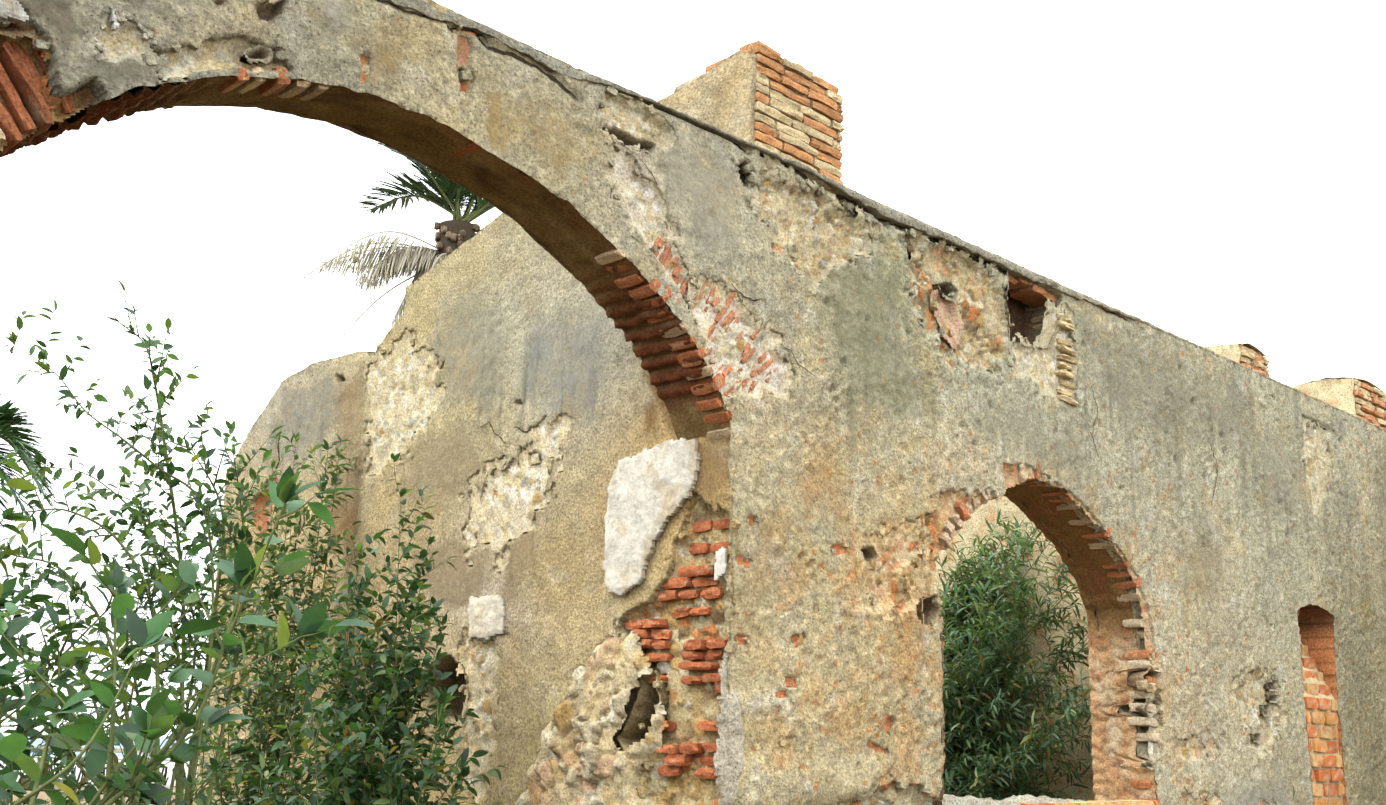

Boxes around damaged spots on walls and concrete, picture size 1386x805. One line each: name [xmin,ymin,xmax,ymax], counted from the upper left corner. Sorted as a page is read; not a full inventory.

spalling [0,0,51,62]
spalling [83,9,288,87]
spalling [597,85,797,414]
spalling [743,151,879,296]
spalling [902,227,1079,412]
spalling [460,413,574,572]
flaking render [603,438,761,805]
flaking render [775,675,802,699]
spalling [791,632,808,648]
flaking render [830,536,849,555]
spalling [835,714,934,805]
spalling [863,462,1157,661]